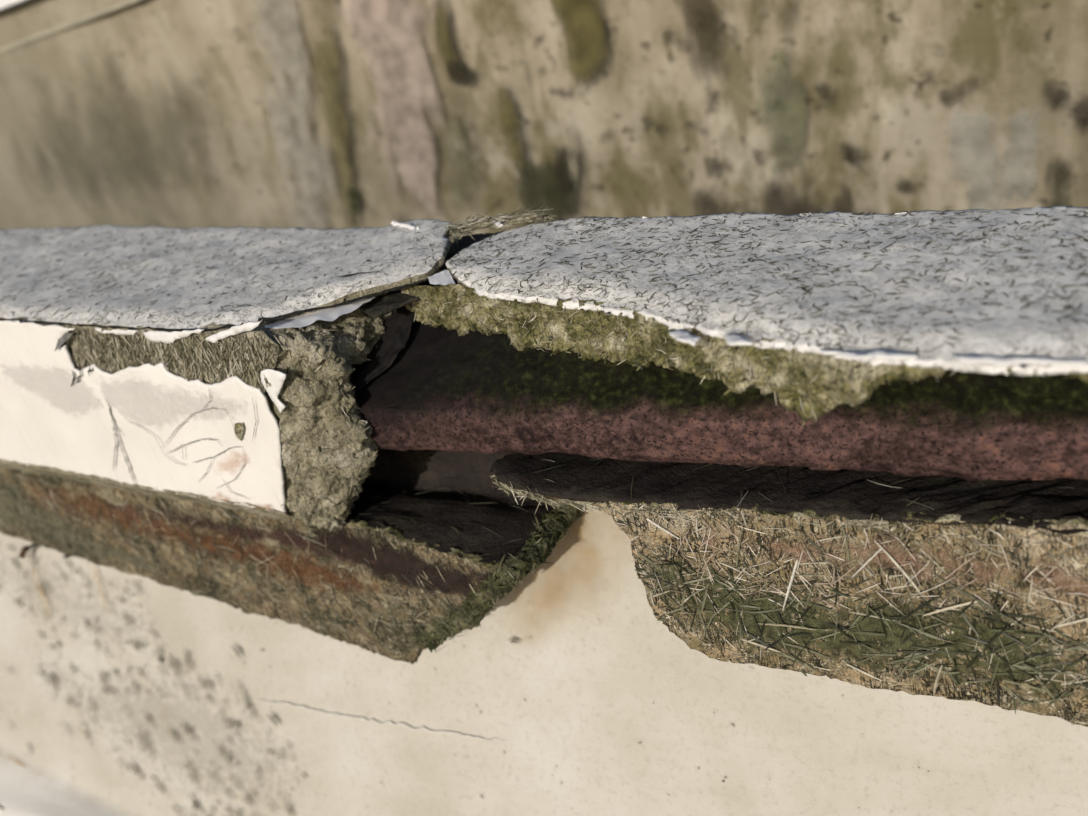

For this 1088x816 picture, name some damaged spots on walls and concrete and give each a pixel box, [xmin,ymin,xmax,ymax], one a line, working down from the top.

water stain [679,0,715,73]
water stain [257,0,359,229]
water stain [329,0,473,215]
water stain [497,87,576,226]
water stain [693,190,728,215]
water stain [764,179,851,215]
water stain [897,180,911,192]
water stain [949,111,1036,209]
water stain [1048,160,1068,206]
water stain [1047,83,1088,128]
crack [0,203,555,332]
spalling [54,269,1088,532]